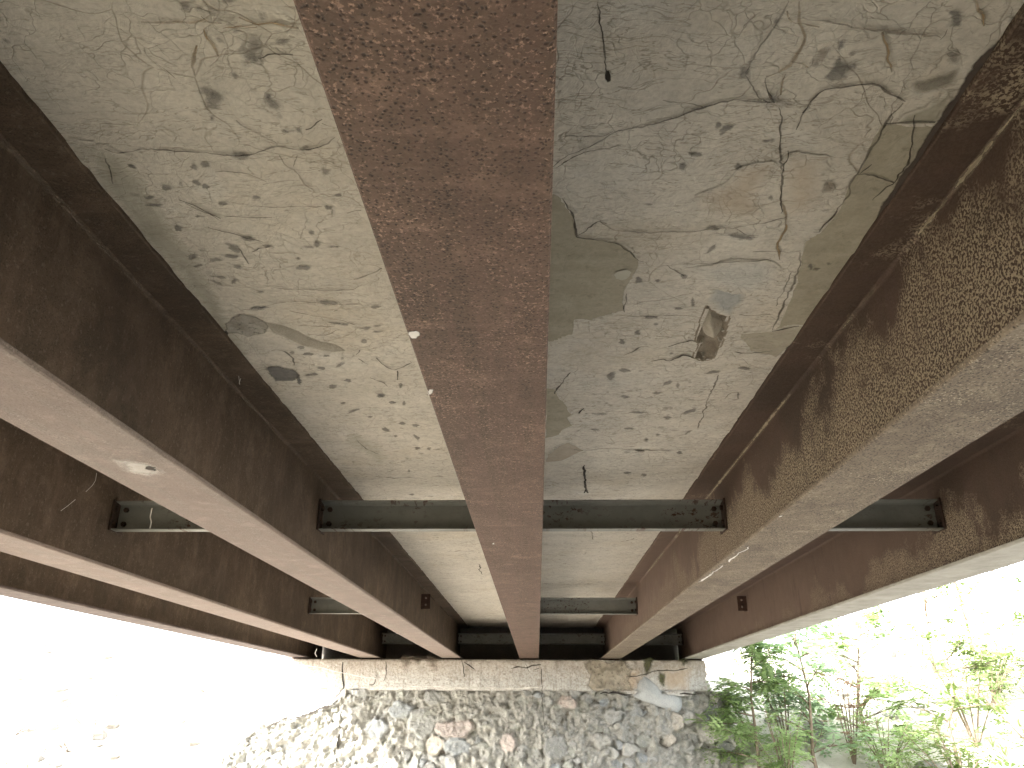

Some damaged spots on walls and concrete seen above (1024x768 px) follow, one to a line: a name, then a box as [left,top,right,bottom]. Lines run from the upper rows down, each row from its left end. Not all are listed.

crack [598,7,608,76]
corrosion [766,11,818,95]
crack [106,119,330,183]
crack [553,78,935,232]
crack [180,200,272,264]
peeling [548,193,644,343]
crack [563,200,639,261]
peeling [687,124,933,363]
leakage [267,346,344,384]
crack [628,315,696,361]
crack [737,258,801,353]
crack [581,465,589,493]